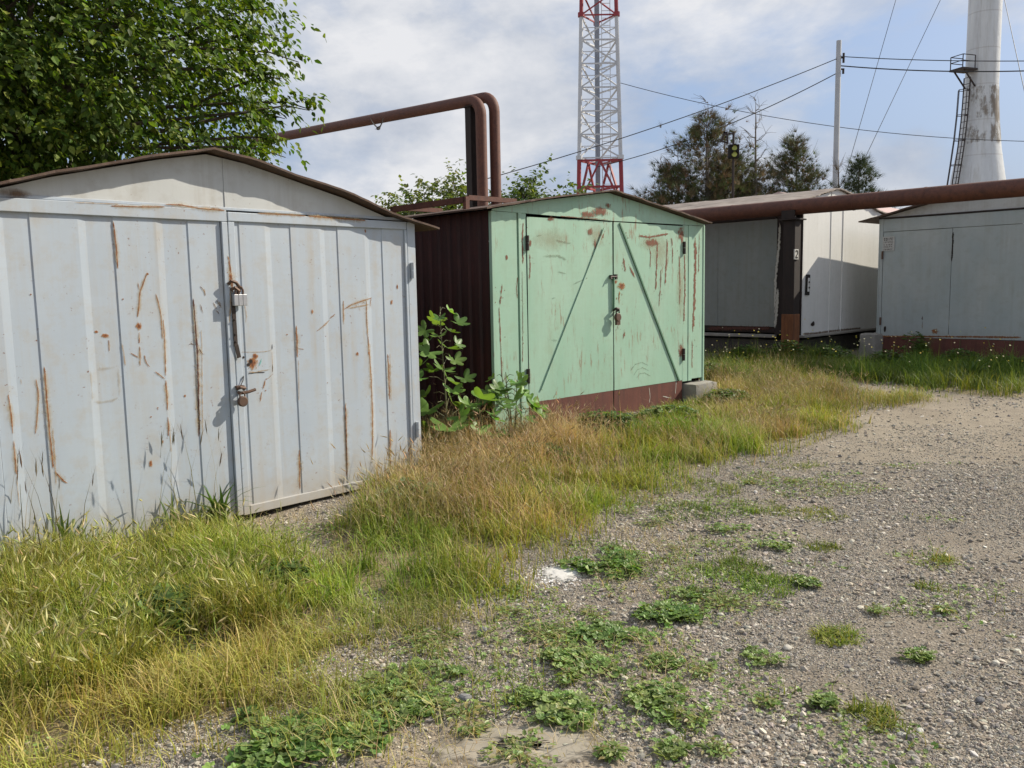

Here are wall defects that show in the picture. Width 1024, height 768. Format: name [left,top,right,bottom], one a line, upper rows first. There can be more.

corrosion [35,367,67,483]
corrosion [151,295,171,442]
corrosion [184,287,206,434]
corrosion [243,351,273,401]
corrosion [332,297,372,389]